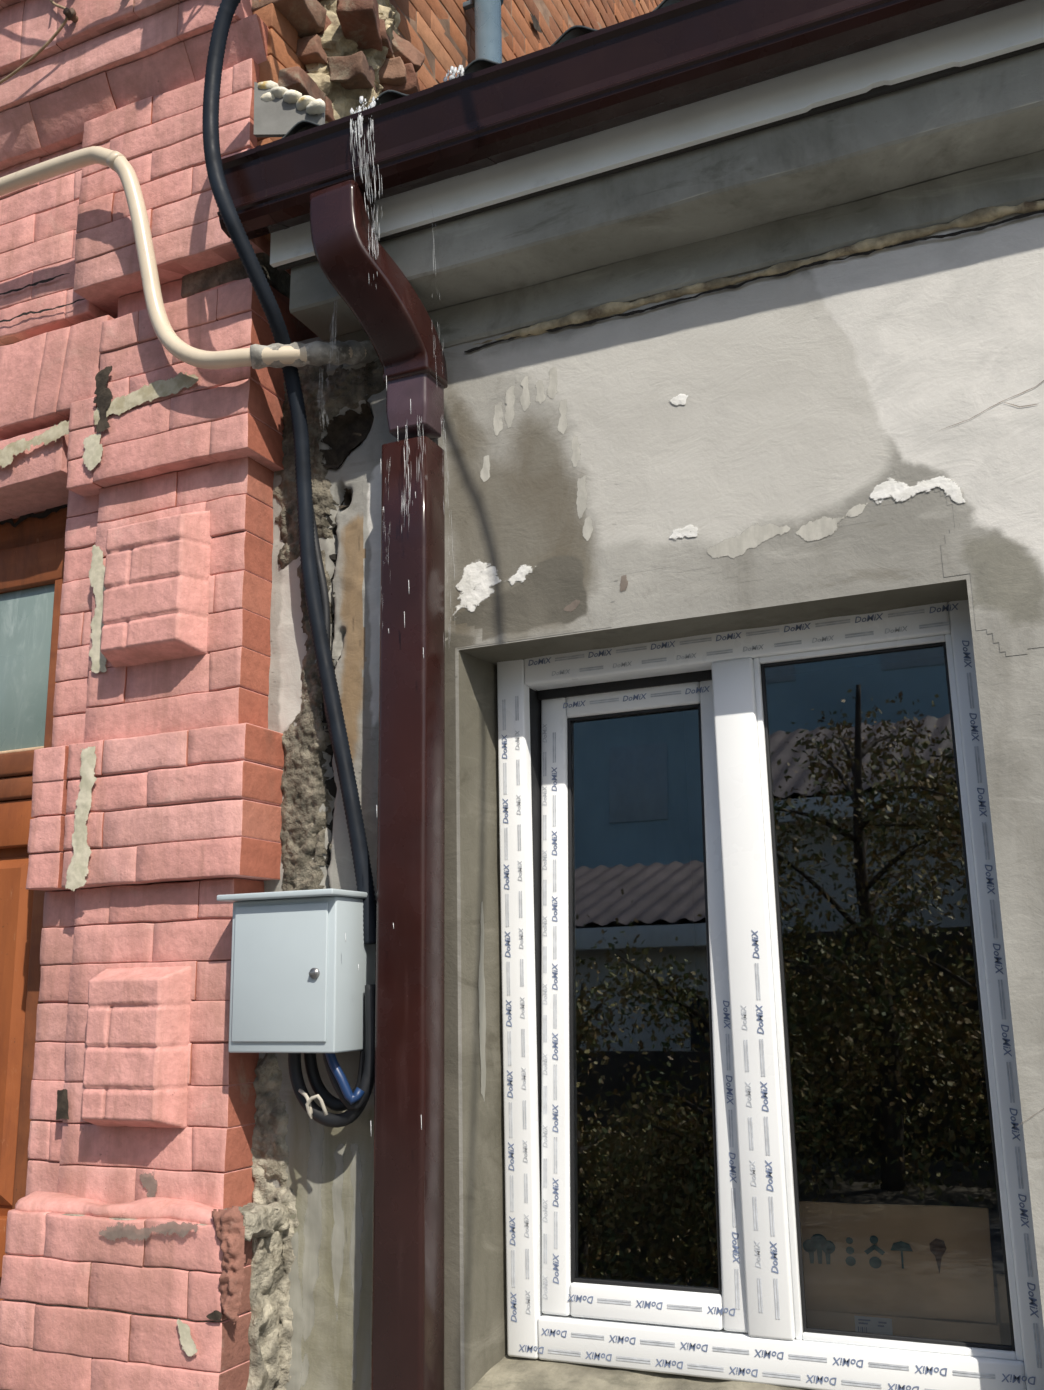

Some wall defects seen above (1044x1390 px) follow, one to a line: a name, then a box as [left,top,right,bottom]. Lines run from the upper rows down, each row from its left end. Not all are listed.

spalling [303,0,425,123]
crack [0,273,84,322]
peeling [0,365,199,471]
flaking render [669,524,699,539]
flaking render [707,476,966,559]
spalling [273,359,386,891]
flaking render [453,561,536,618]
leakage [941,515,1044,656]
spalling [206,1053,299,1390]